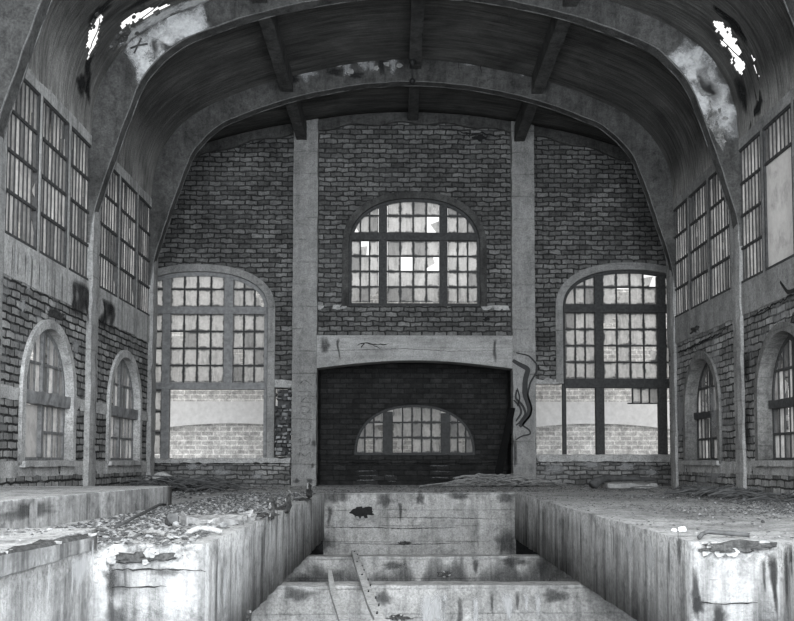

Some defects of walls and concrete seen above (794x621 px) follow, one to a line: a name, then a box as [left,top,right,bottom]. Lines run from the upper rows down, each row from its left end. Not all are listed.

spalling [89,4,148,56]
leakage [714,7,746,41]
leakage [670,47,763,130]
spalling [257,483,313,518]
hole [349,506,374,521]
leakage [290,569,336,599]
leakage [376,563,412,581]
leakage [423,565,467,582]
leakage [482,534,557,582]
spalling [698,539,777,557]
leakage [503,591,563,618]